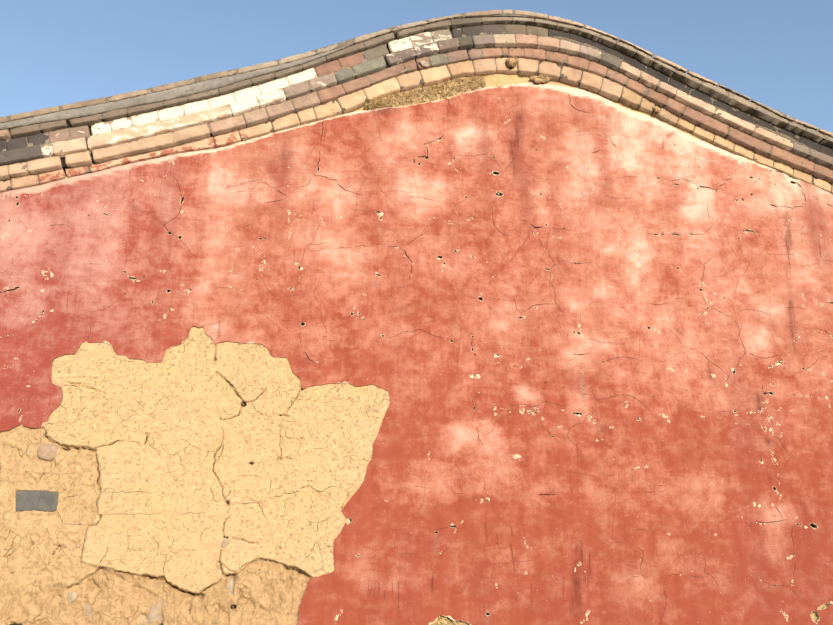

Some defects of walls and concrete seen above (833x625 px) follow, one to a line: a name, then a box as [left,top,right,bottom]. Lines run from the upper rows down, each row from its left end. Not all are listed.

crack [60,157,71,177]
crack [67,122,99,163]
crack [164,162,199,273]
crack [381,136,442,200]
crack [454,105,515,235]
crack [770,170,833,210]
crack [379,274,668,482]
crack [514,220,639,362]
crack [649,213,797,432]
crack [44,346,338,597]
crack [742,457,807,602]
spalling [811,601,833,624]